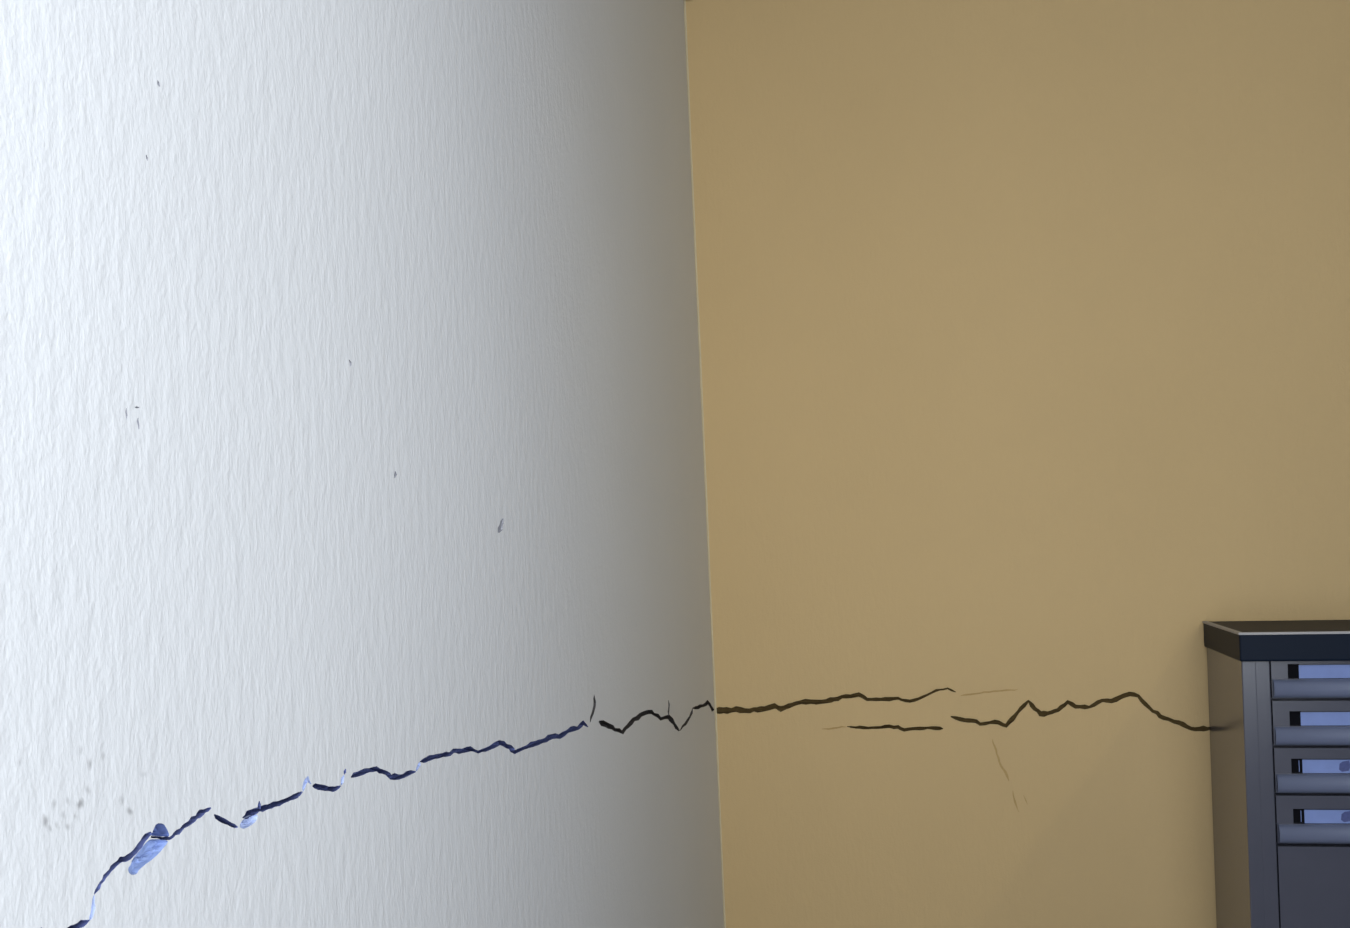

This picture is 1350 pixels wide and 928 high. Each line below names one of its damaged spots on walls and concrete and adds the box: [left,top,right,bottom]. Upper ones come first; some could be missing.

spalling [128,823,169,875]
crack [41,687,1210,928]